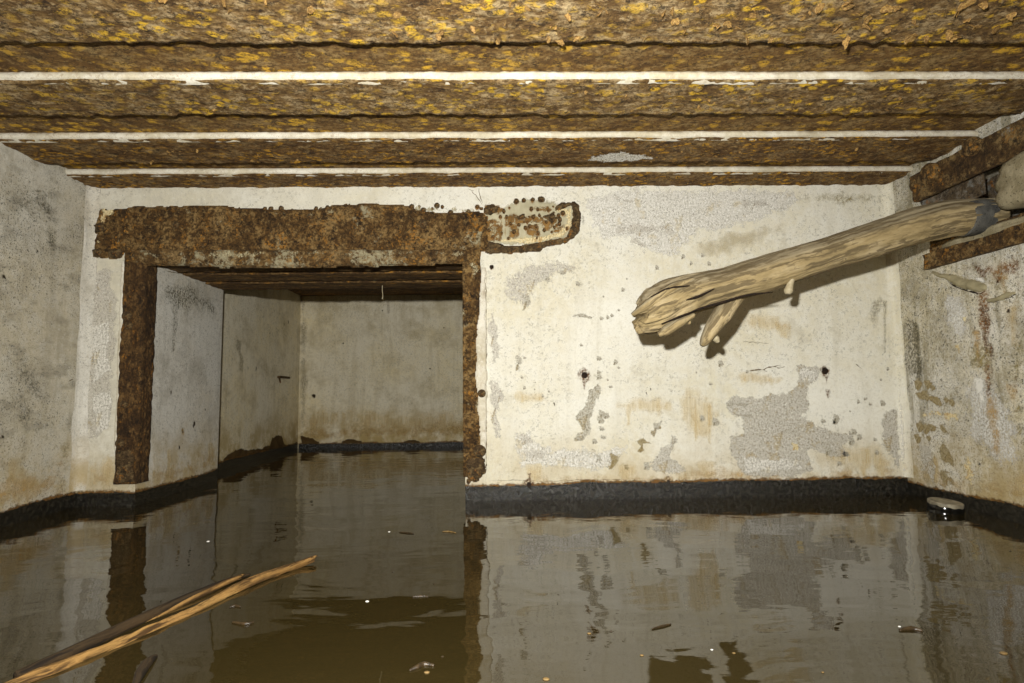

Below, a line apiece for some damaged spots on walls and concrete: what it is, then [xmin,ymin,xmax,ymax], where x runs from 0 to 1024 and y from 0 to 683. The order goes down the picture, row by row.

rust [533,13,582,46]
rust [841,0,902,34]
rust [945,0,1017,42]
rust [92,248,123,259]
rust [409,196,581,270]
water stain [905,320,922,375]
peeling [514,356,687,475]
peeling [726,364,901,478]
water stain [966,345,1021,461]
rust [116,450,134,483]
rust [466,457,487,484]
water stain [465,474,1024,524]